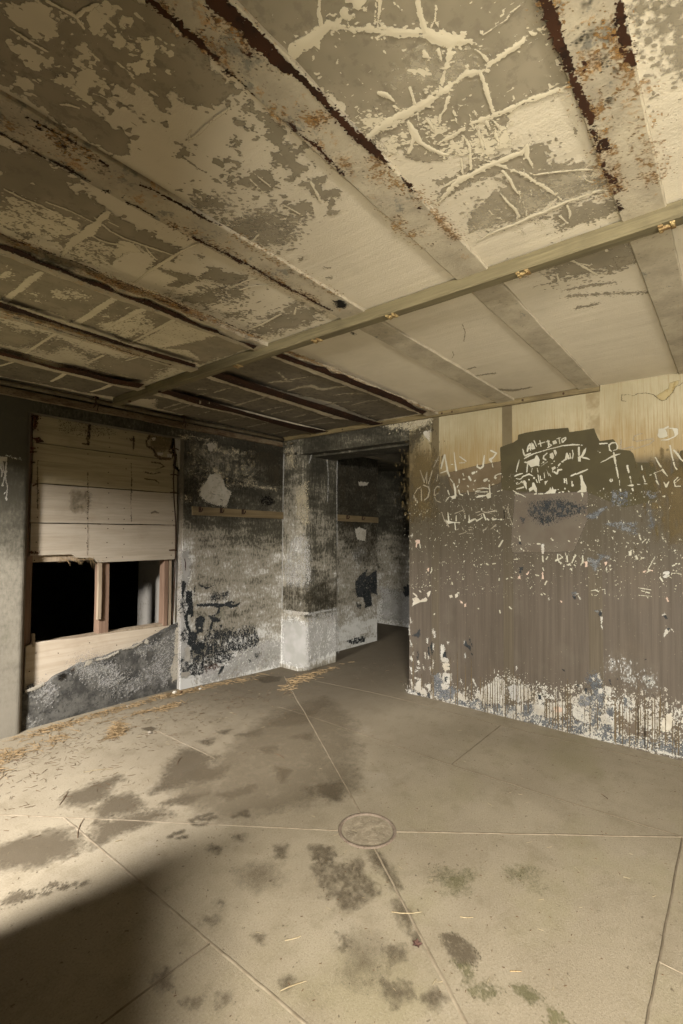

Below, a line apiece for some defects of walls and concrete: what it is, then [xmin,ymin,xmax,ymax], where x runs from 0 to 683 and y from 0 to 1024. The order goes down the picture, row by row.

peeling [0,0,343,263]
rust [145,0,467,249]
rust [526,0,677,211]
peeling [625,0,683,124]
peeling [0,255,248,381]
peeling [0,145,326,337]
leakage [0,357,418,663]
leakage [26,628,176,728]
peeling [355,567,683,759]
leakage [0,830,78,868]
leakage [67,740,227,844]
leakage [312,846,374,908]